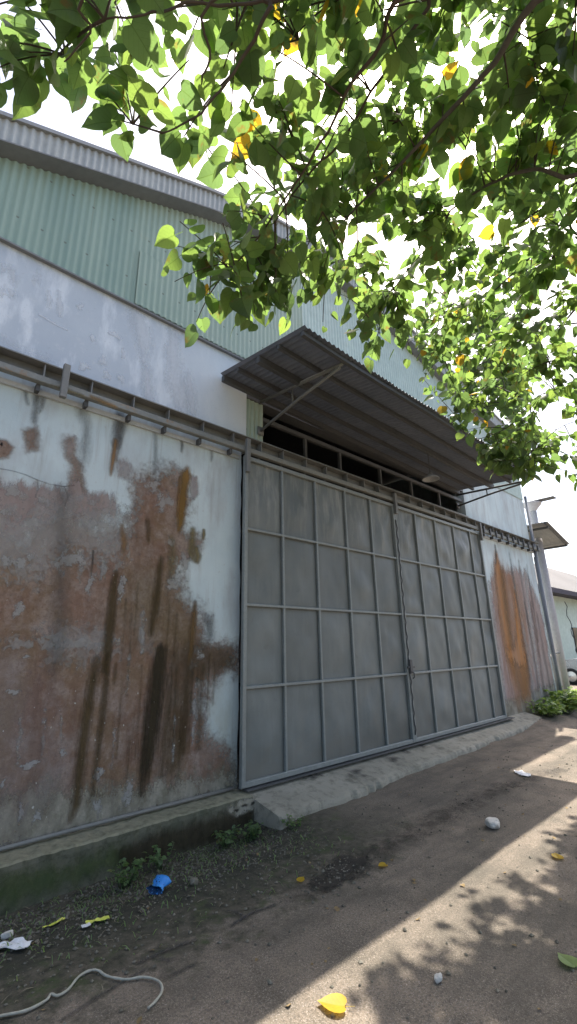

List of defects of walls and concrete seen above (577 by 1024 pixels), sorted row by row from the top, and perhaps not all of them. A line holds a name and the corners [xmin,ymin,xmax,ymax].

rust [56,386,124,474]
rust [177,468,205,563]
water stain [71,572,117,816]
water stain [140,557,166,795]
rust [495,554,529,697]